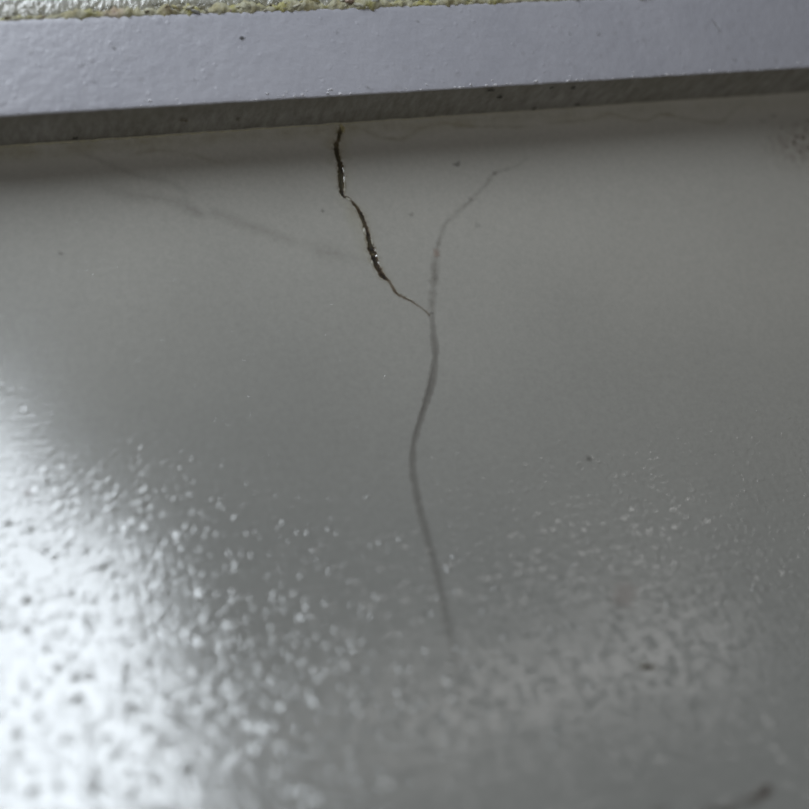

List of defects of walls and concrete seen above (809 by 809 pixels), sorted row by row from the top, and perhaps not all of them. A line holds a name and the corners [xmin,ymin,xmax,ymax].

crack [334,125,414,302]